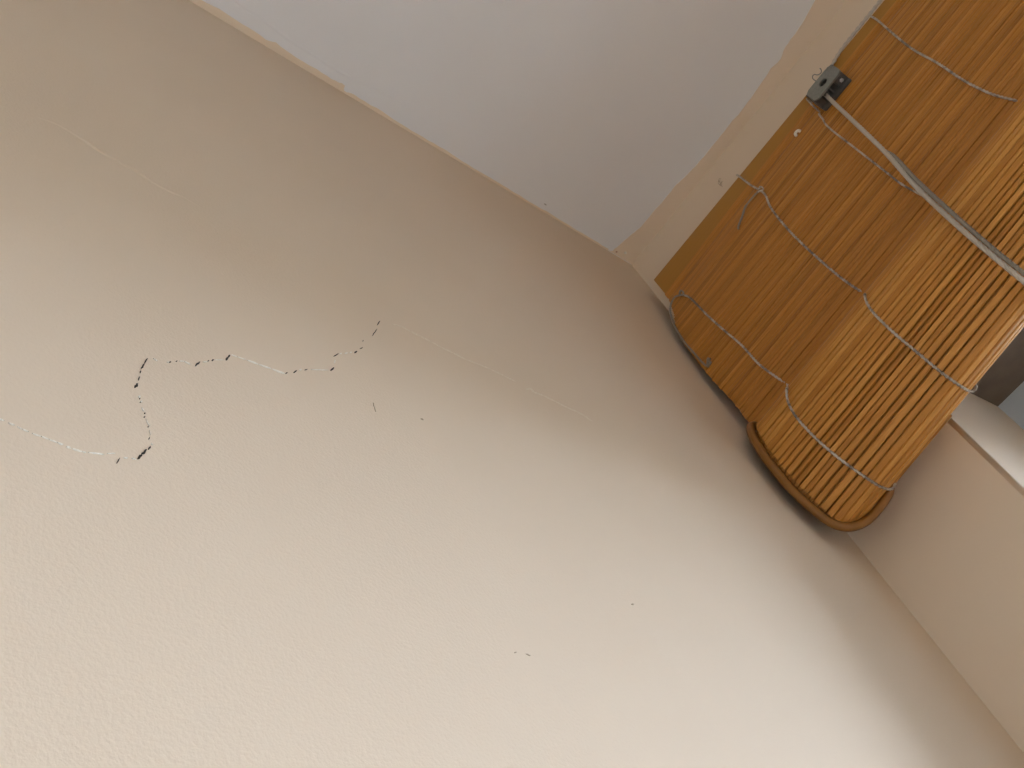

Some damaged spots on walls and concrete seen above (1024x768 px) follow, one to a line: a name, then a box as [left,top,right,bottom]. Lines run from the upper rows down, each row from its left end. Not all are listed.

crack [0,321,380,464]